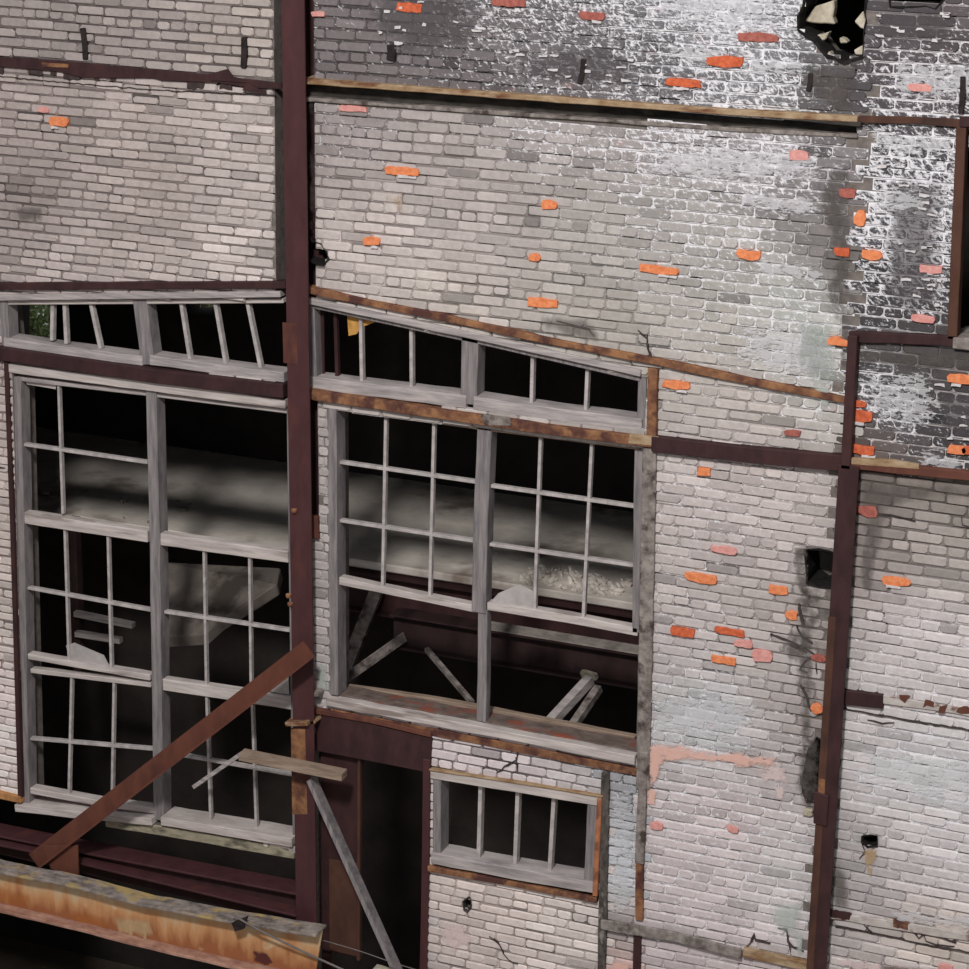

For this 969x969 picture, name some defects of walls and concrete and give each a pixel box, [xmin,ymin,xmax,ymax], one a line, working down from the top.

peeling [379,0,482,47]
spalling [579,11,606,24]
spalling [797,0,951,64]
peeling [509,49,641,90]
spalling [855,400,873,426]
peeling [929,374,969,455]
spalling [854,444,876,458]
crack [770,633,818,674]
rust [923,699,969,714]
crack [835,924,969,953]
rust [253,951,272,965]